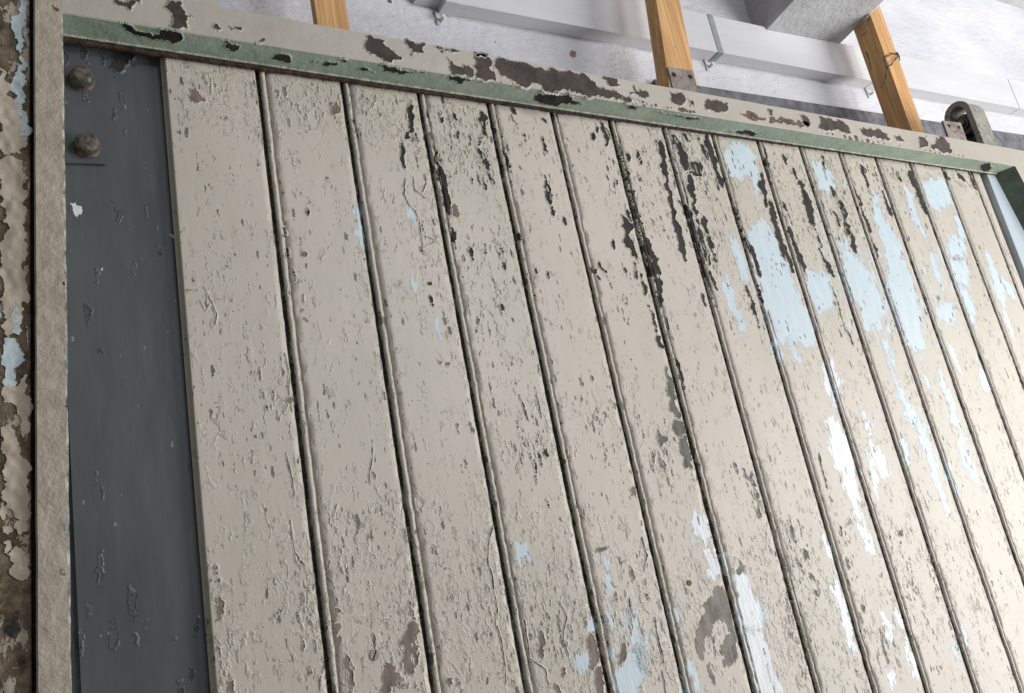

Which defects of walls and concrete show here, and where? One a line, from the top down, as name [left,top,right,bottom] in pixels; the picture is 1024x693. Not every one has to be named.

peeling [118,21,185,45]
peeling [270,52,293,64]
peeling [311,57,427,75]
peeling [0,0,33,581]
peeling [405,203,444,341]
peeling [398,91,583,317]
peeling [588,110,994,518]
peeling [984,249,1017,342]
peeling [821,355,892,570]
peeling [537,544,651,693]
peeling [688,508,783,693]
peeling [733,461,859,681]